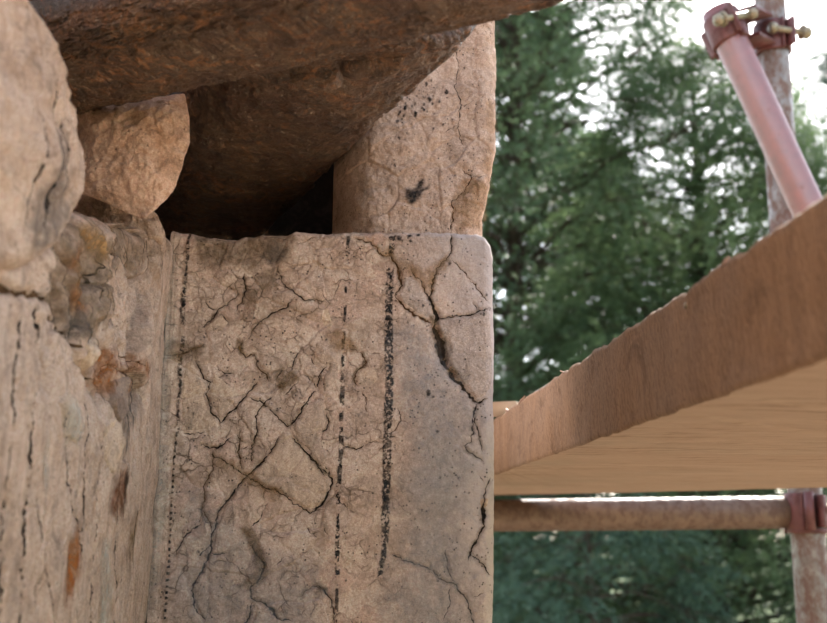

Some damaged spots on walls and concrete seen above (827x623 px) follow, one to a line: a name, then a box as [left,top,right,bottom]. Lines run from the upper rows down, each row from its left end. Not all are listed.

crack [446,52,472,143]
crack [0,283,85,623]
crack [81,262,106,300]
crack [59,356,145,623]
crack [164,268,348,623]
crack [349,347,367,412]
crack [356,169,490,574]
crack [393,550,480,623]